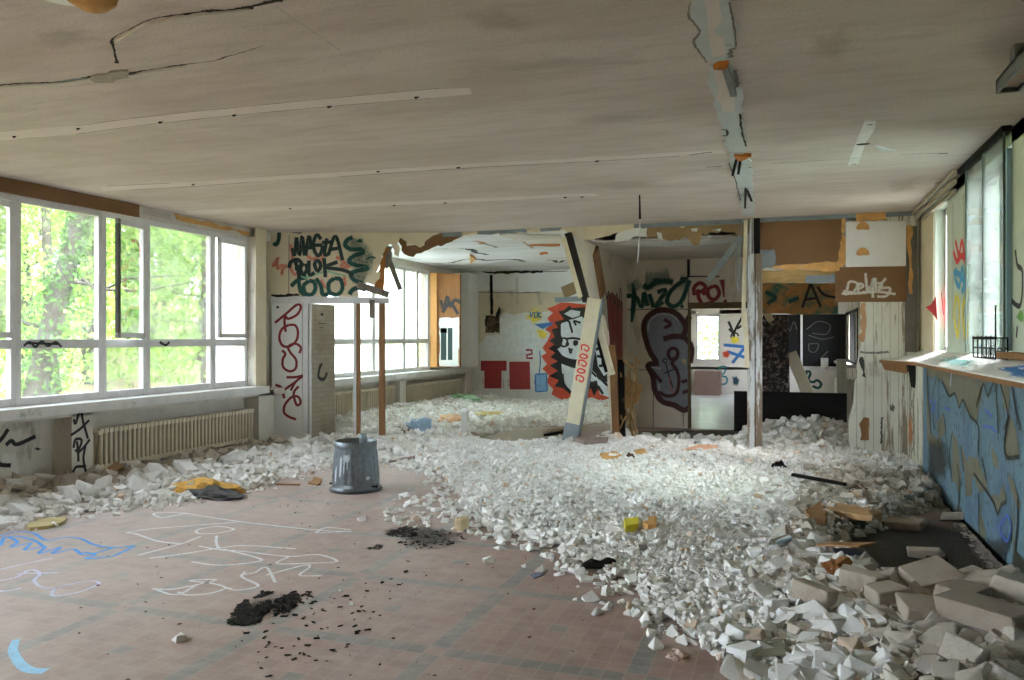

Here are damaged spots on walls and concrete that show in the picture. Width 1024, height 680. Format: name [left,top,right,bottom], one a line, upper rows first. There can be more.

crack [0,0,338,90]
peeling [687,0,755,216]
peeling [499,233,563,255]
peeling [609,228,737,247]
peeling [858,303,889,378]
peeling [859,417,869,440]